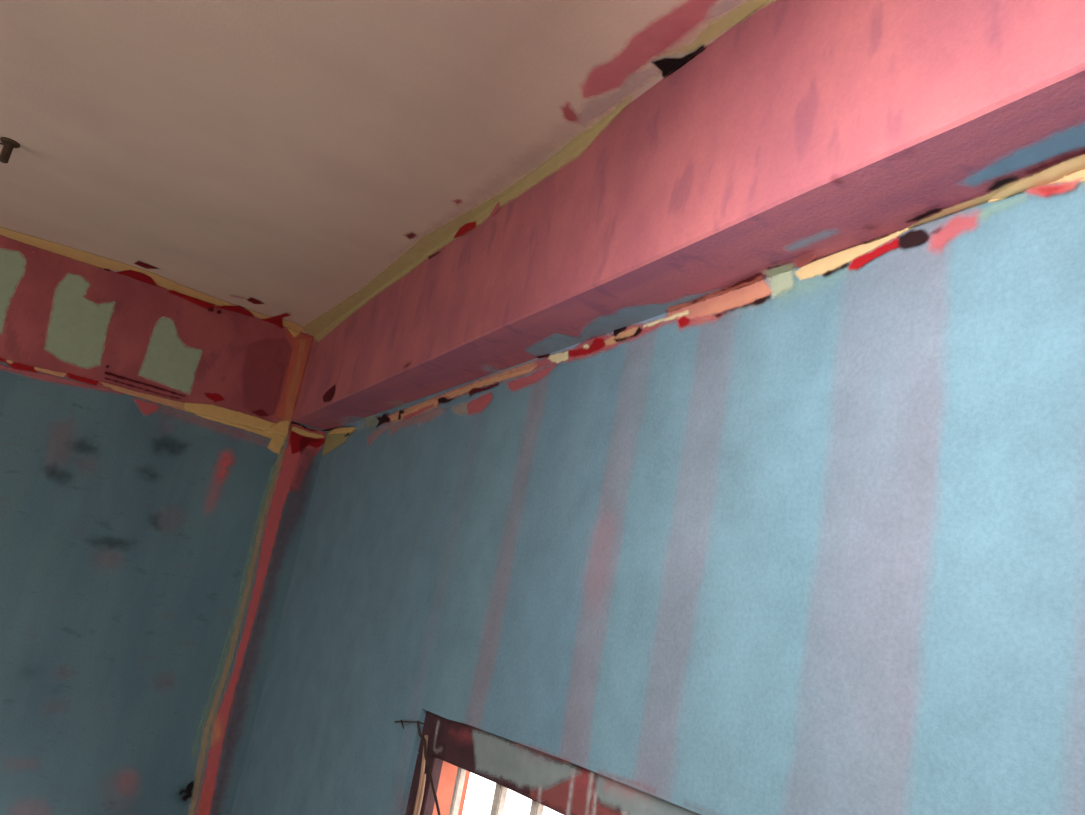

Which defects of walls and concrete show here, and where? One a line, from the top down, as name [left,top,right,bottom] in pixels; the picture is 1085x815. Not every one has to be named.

spalling [652,46,704,78]
peeling [376,155,1085,427]
peeling [0,358,357,491]